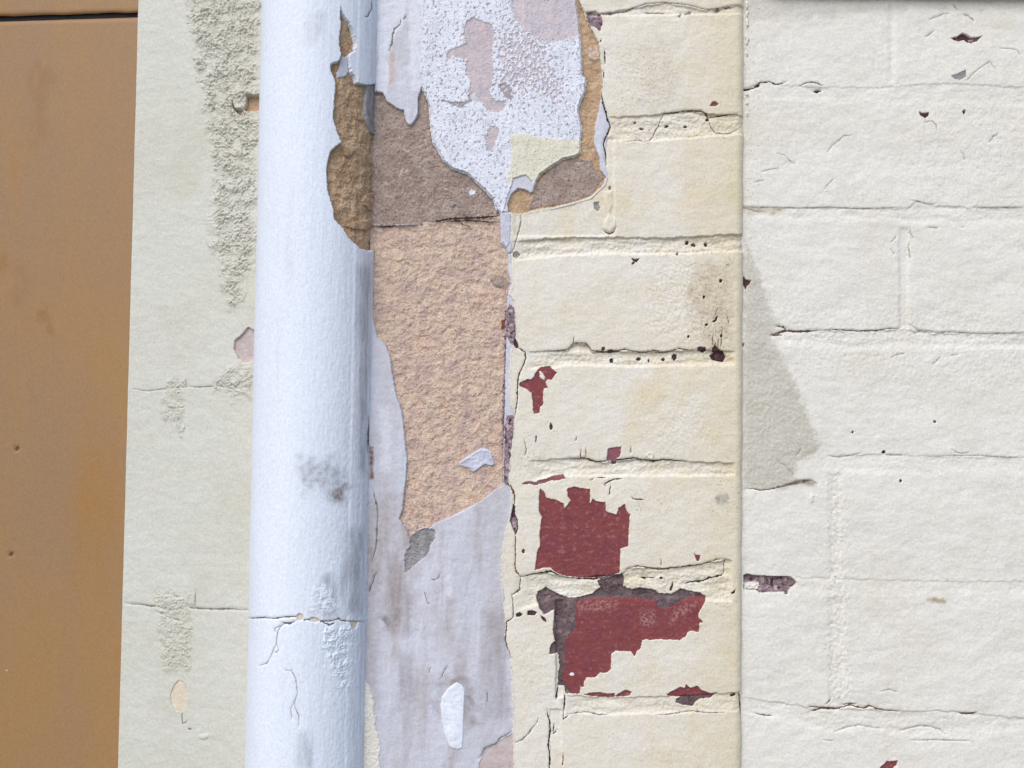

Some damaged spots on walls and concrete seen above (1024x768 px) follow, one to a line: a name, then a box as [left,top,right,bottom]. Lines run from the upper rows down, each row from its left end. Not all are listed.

spalling [326,0,611,572]
spalling [235,328,254,363]
crack [514,308,729,418]
crack [569,437,687,500]
peeling [516,475,705,697]
crack [505,536,725,656]
spalling [731,574,795,594]
peeling [364,680,381,768]
peeling [441,682,465,749]
peeling [479,733,514,768]
peeling [667,684,717,706]